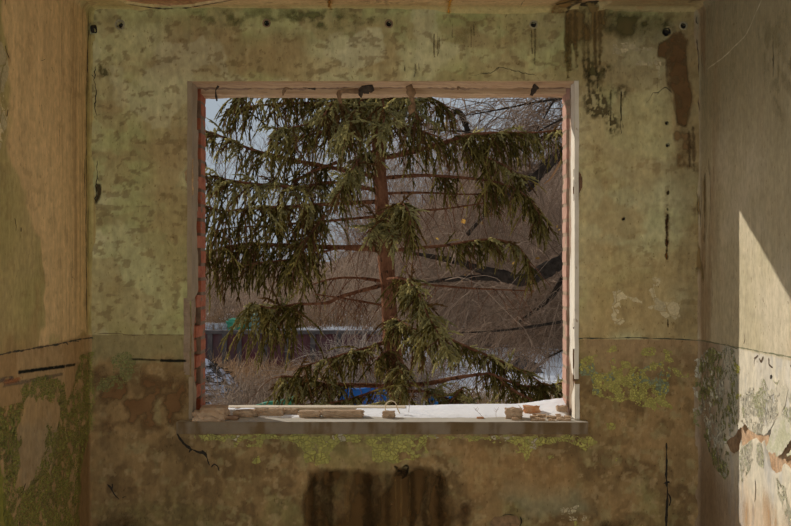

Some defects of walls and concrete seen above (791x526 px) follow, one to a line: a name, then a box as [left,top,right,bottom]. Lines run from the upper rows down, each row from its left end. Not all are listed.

spalling [126,0,231,10]
leakage [551,0,649,134]
leakage [658,21,695,167]
peeling [0,352,97,526]
crack [177,434,219,471]
peeling [573,345,791,523]